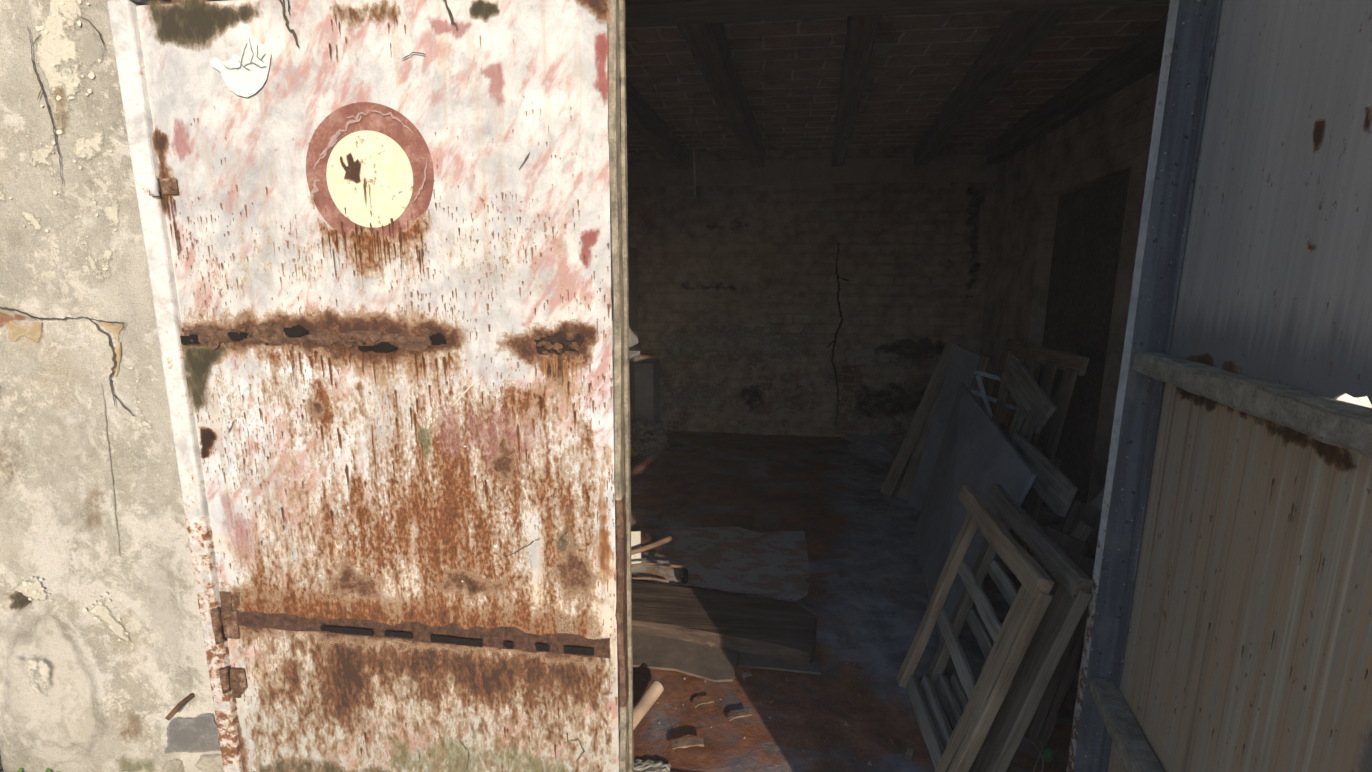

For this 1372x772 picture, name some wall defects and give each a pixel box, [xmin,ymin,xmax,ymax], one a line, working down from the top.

crack [27,27,63,184]
flaking render [27,0,113,195]
flaking render [0,312,42,342]
crack [826,243,849,425]
crack [0,307,134,556]
rust [179,152,616,772]
rust [1177,387,1355,471]
spalling [10,577,52,611]
flaking render [83,592,129,641]